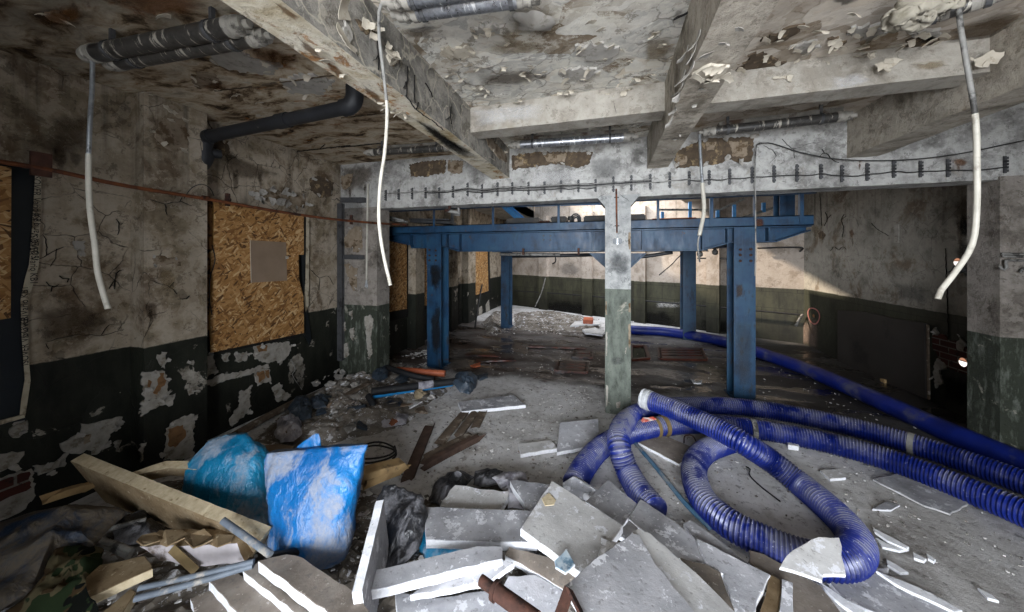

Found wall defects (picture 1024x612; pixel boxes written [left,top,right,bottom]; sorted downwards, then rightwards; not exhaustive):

peeling [519,20,634,95]
flaking render [665,12,951,128]
peeling [970,50,1005,68]
spalling [409,158,466,177]
spalling [486,138,593,171]
spalling [666,133,760,169]
crack [40,235,69,292]
peeling [343,310,373,359]
peeling [138,341,296,445]
peeling [449,300,620,480]
peeling [159,414,198,461]
peeling [0,416,125,521]